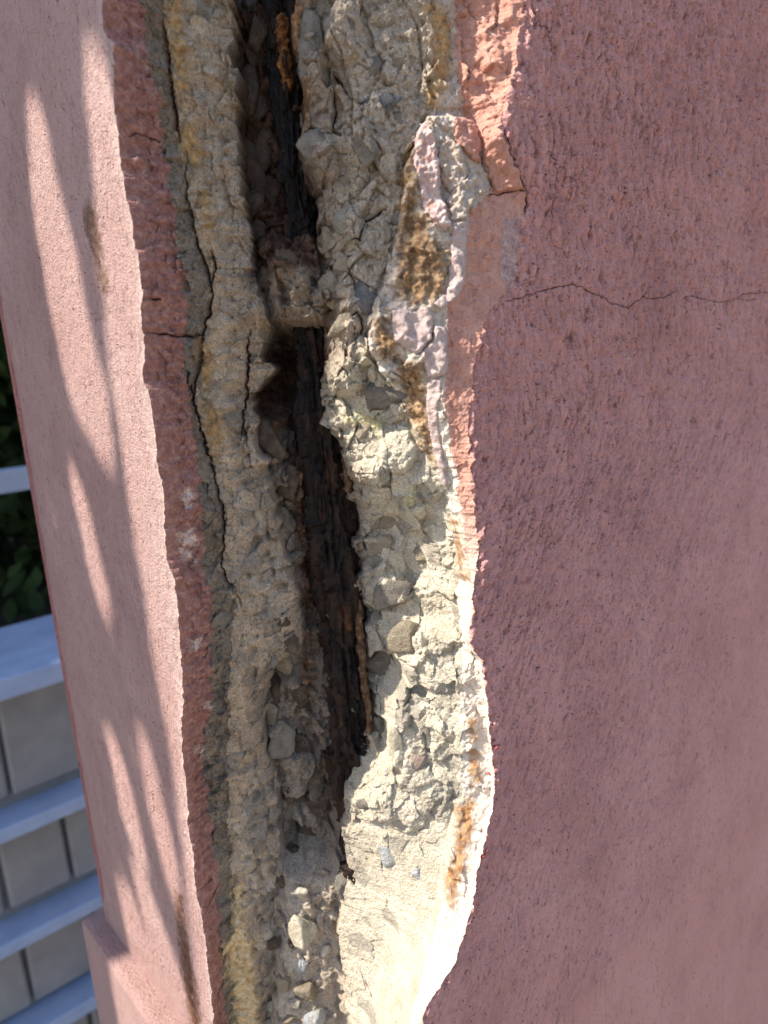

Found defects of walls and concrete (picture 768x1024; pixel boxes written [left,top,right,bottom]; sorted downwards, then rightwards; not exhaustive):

crack [129,26,181,143]
corrosion [273,4,310,129]
corrosion [395,142,449,303]
crack [155,173,233,587]
corrosion [374,319,438,467]
spalling [100,0,526,1024]
corrosion [339,444,354,495]
corrosion [355,599,374,748]
corrosion [445,718,480,907]